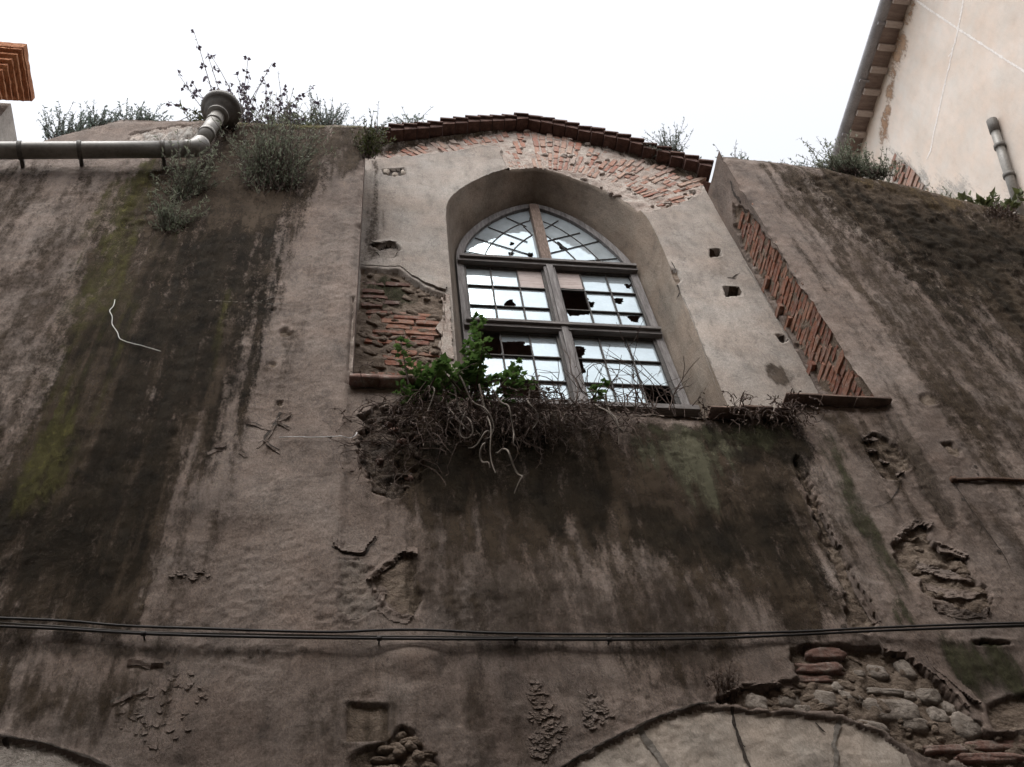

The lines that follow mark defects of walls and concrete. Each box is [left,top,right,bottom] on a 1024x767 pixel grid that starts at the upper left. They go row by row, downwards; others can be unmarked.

flaking render [371,129,707,212]
flaking render [349,237,454,375]
damp [783,168,1024,374]
damp [0,124,378,649]
spalling [861,432,910,480]
damp [927,377,997,439]
flaking render [333,525,421,624]
damp [393,395,858,687]
spalling [718,460,1024,767]
spalling [351,731,438,767]
crack [561,700,751,767]
crack [815,717,842,767]